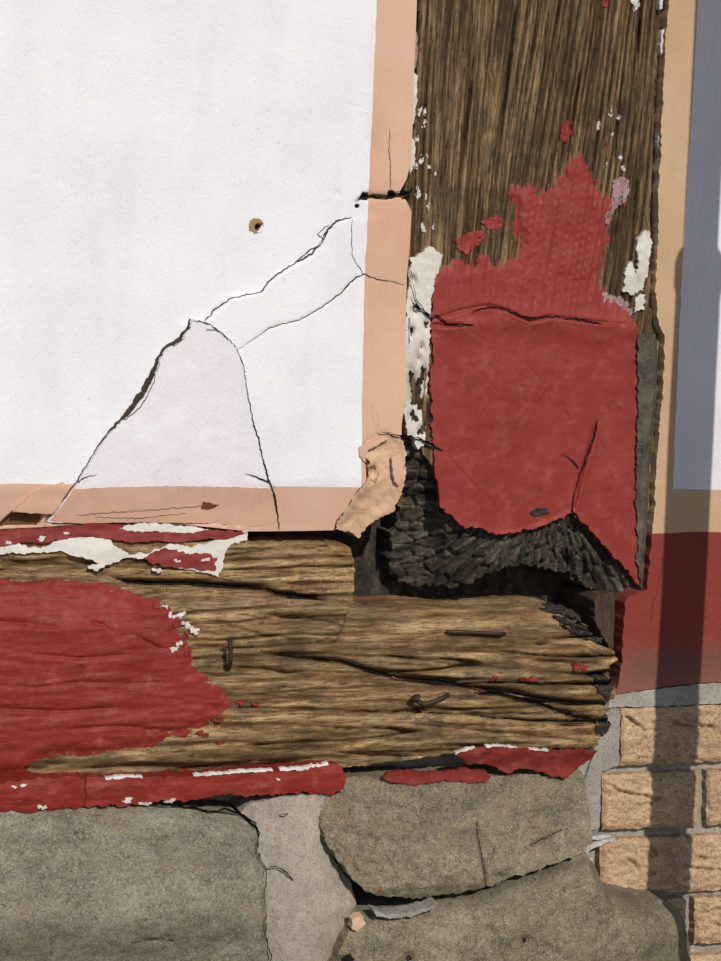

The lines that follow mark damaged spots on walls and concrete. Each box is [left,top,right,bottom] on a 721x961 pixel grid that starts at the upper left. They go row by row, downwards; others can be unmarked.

peeling [588,104,624,146]
peeling [387,186,430,211]
peeling [604,155,636,234]
peeling [454,215,504,255]
peeling [602,292,633,316]
crack [45,143,601,528]
spalling [409,365,431,435]
spalling [334,432,407,538]
peeling [162,605,200,653]
peeling [454,743,598,779]
peeling [122,797,176,806]
crack [476,822,487,888]